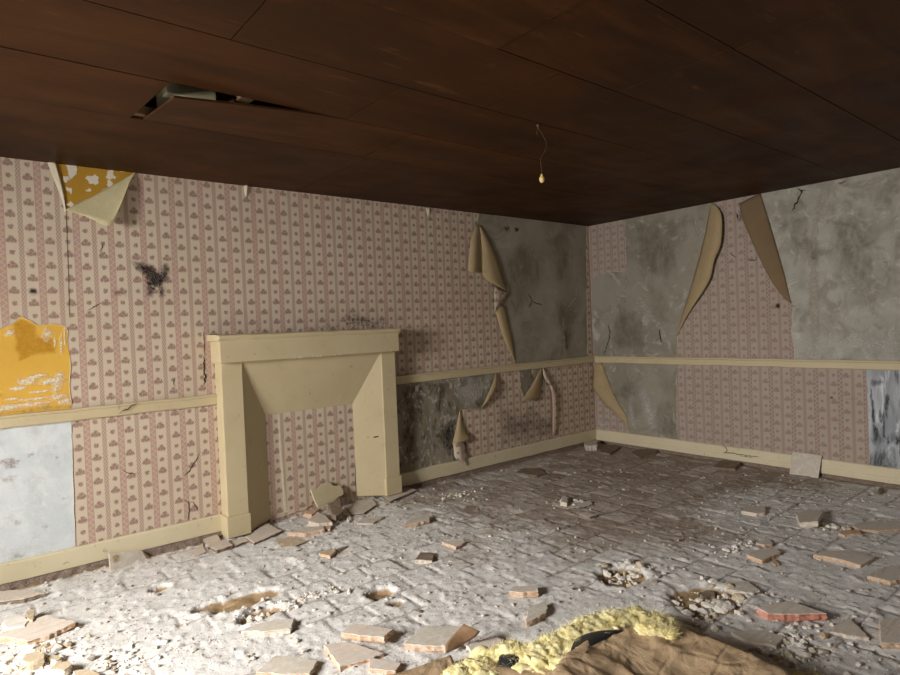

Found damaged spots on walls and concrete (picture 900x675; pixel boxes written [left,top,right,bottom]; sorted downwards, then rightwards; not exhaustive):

peeling [62,165,124,207]
peeling [0,317,72,416]
damp [138,263,167,295]
flaking render [477,203,715,439]
flaking render [761,168,900,361]
flaking render [0,421,76,563]